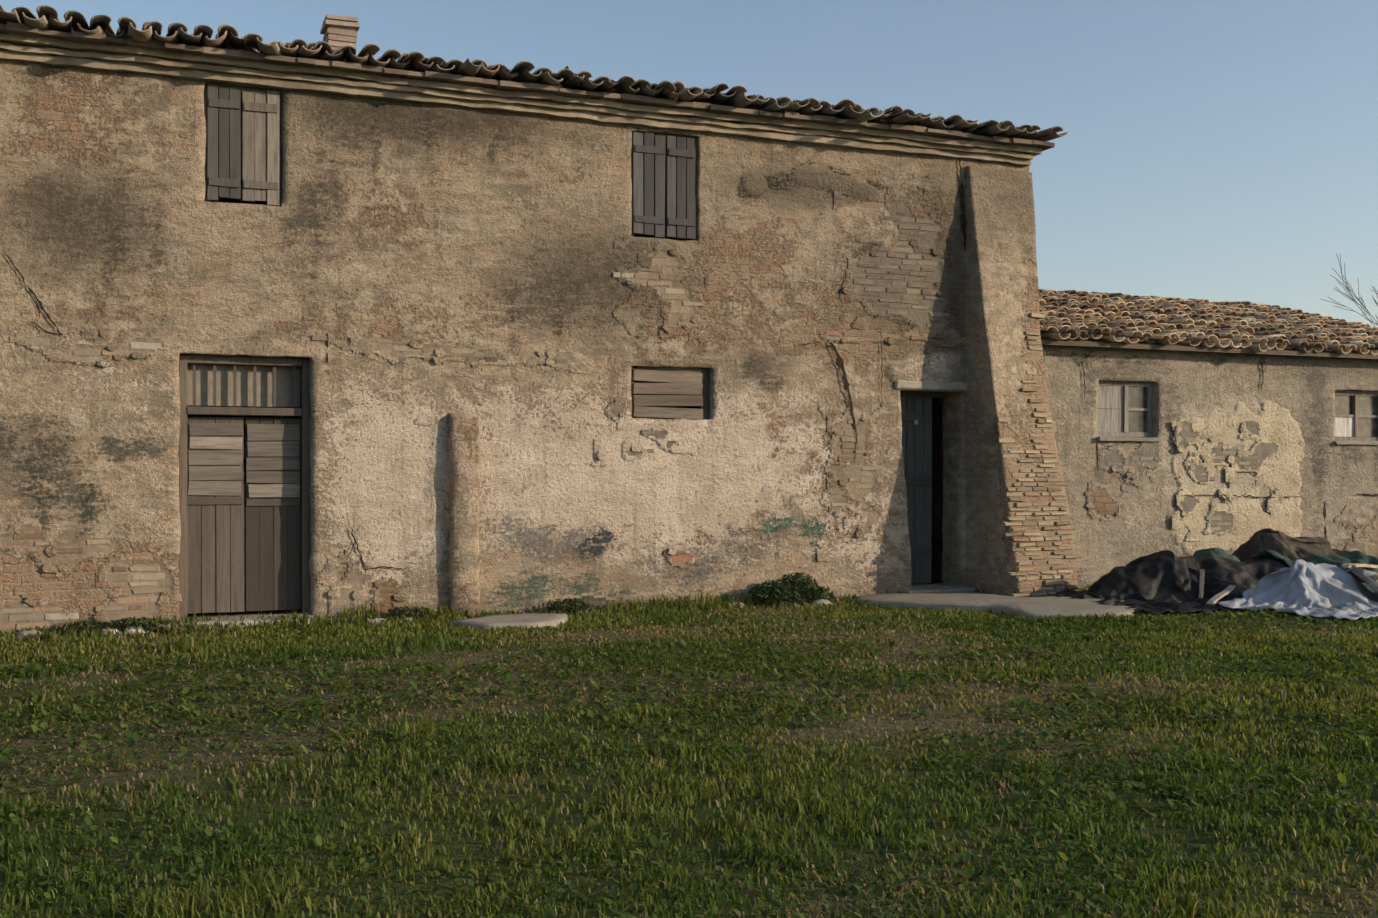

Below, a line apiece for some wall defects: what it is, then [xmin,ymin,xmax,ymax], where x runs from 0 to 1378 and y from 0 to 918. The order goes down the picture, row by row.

crack [958,158,966,251]
crack [2,249,63,336]
flaking render [820,171,963,347]
crack [798,329,883,462]
damp [28,478,52,530]
damp [80,484,96,535]
flaking render [0,518,182,635]
damp [96,436,168,461]
flaking render [317,549,406,619]
crack [346,514,404,580]
flaking render [998,371,1125,597]
flaking render [1170,400,1305,556]